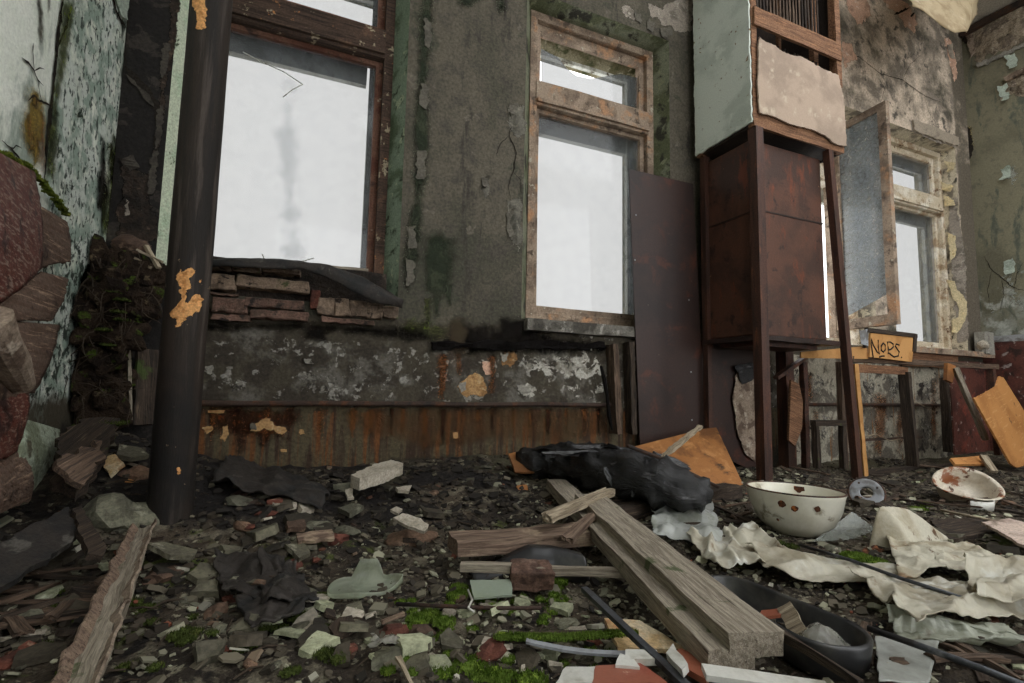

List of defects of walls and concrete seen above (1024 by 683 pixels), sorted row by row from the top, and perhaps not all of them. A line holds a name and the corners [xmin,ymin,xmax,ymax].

flaking render [622,0,693,38]
leakage [87,140,114,234]
flaking render [113,0,208,243]
peeling [404,0,432,286]
crack [496,109,522,197]
peeling [999,165,1017,185]
peeling [170,268,204,327]
leakage [422,234,453,323]
peeling [940,161,969,343]
peeling [296,359,334,393]
peeling [457,334,614,398]